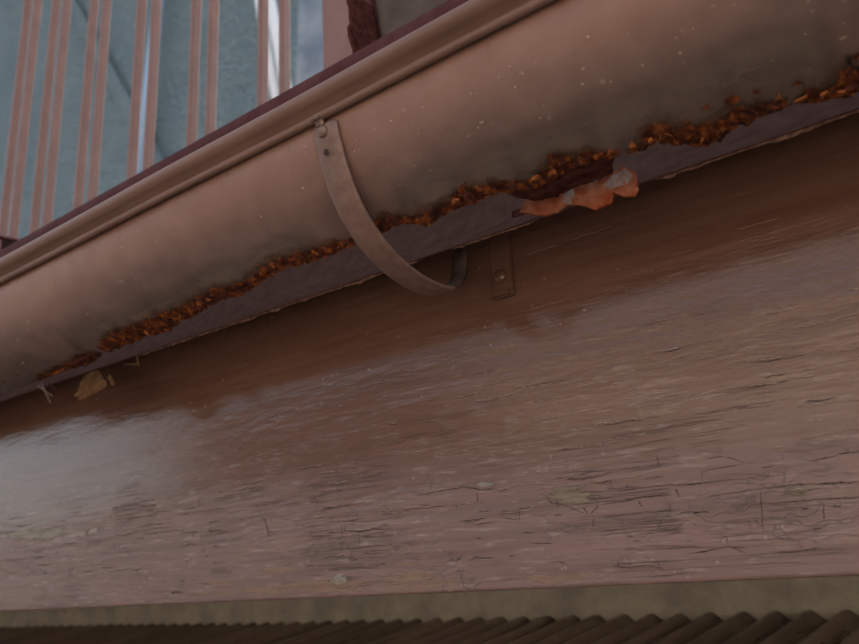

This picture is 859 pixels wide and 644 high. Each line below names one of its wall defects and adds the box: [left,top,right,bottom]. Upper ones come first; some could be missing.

peeling [505,156,640,218]
rust [374,52,859,234]
rust [36,237,356,381]
crack [388,338,859,456]
crack [0,428,859,602]